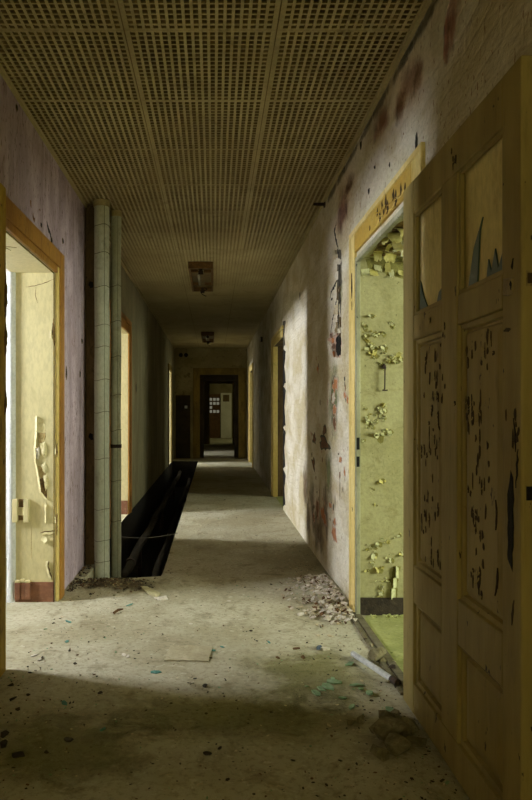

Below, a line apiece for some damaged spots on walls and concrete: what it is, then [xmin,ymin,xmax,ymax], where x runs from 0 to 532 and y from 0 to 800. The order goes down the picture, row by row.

peeling [351,221,403,305]
spalling [327,330,342,358]
peeling [362,314,403,371]
spalling [311,376,349,478]
peeling [362,403,394,444]
spalling [312,497,337,543]
peeling [363,533,403,599]